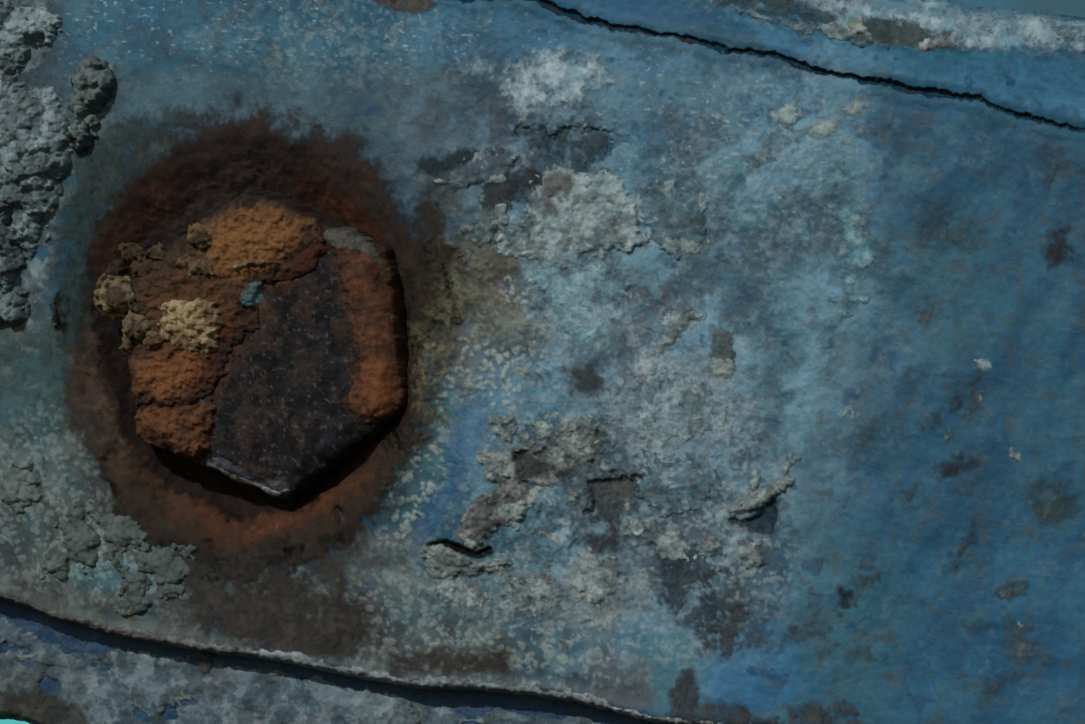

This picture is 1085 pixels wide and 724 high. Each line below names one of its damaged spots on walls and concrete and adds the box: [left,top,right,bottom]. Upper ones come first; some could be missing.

crack [528,0,1085,132]
peeling [710,0,1085,52]
corrosion [59,95,455,659]
peeling [417,114,760,553]
corrosion [389,645,512,675]
spalling [428,540,491,556]
spalling [649,549,748,656]
peeling [727,453,802,569]